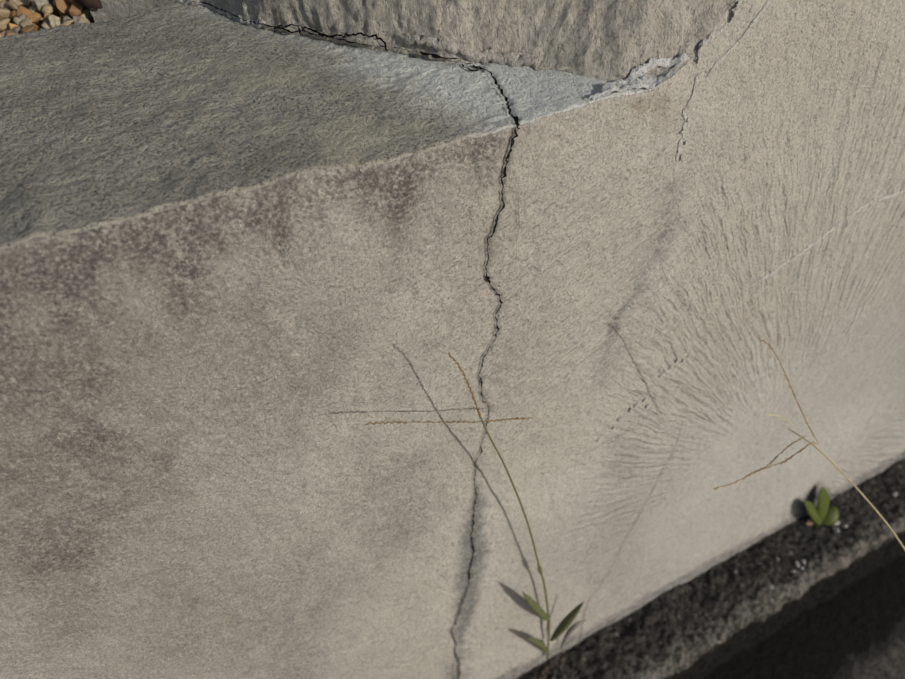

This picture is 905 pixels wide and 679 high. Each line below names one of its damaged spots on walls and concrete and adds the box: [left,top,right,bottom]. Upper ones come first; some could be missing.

crack [186,0,520,678]
crack [695,0,742,64]